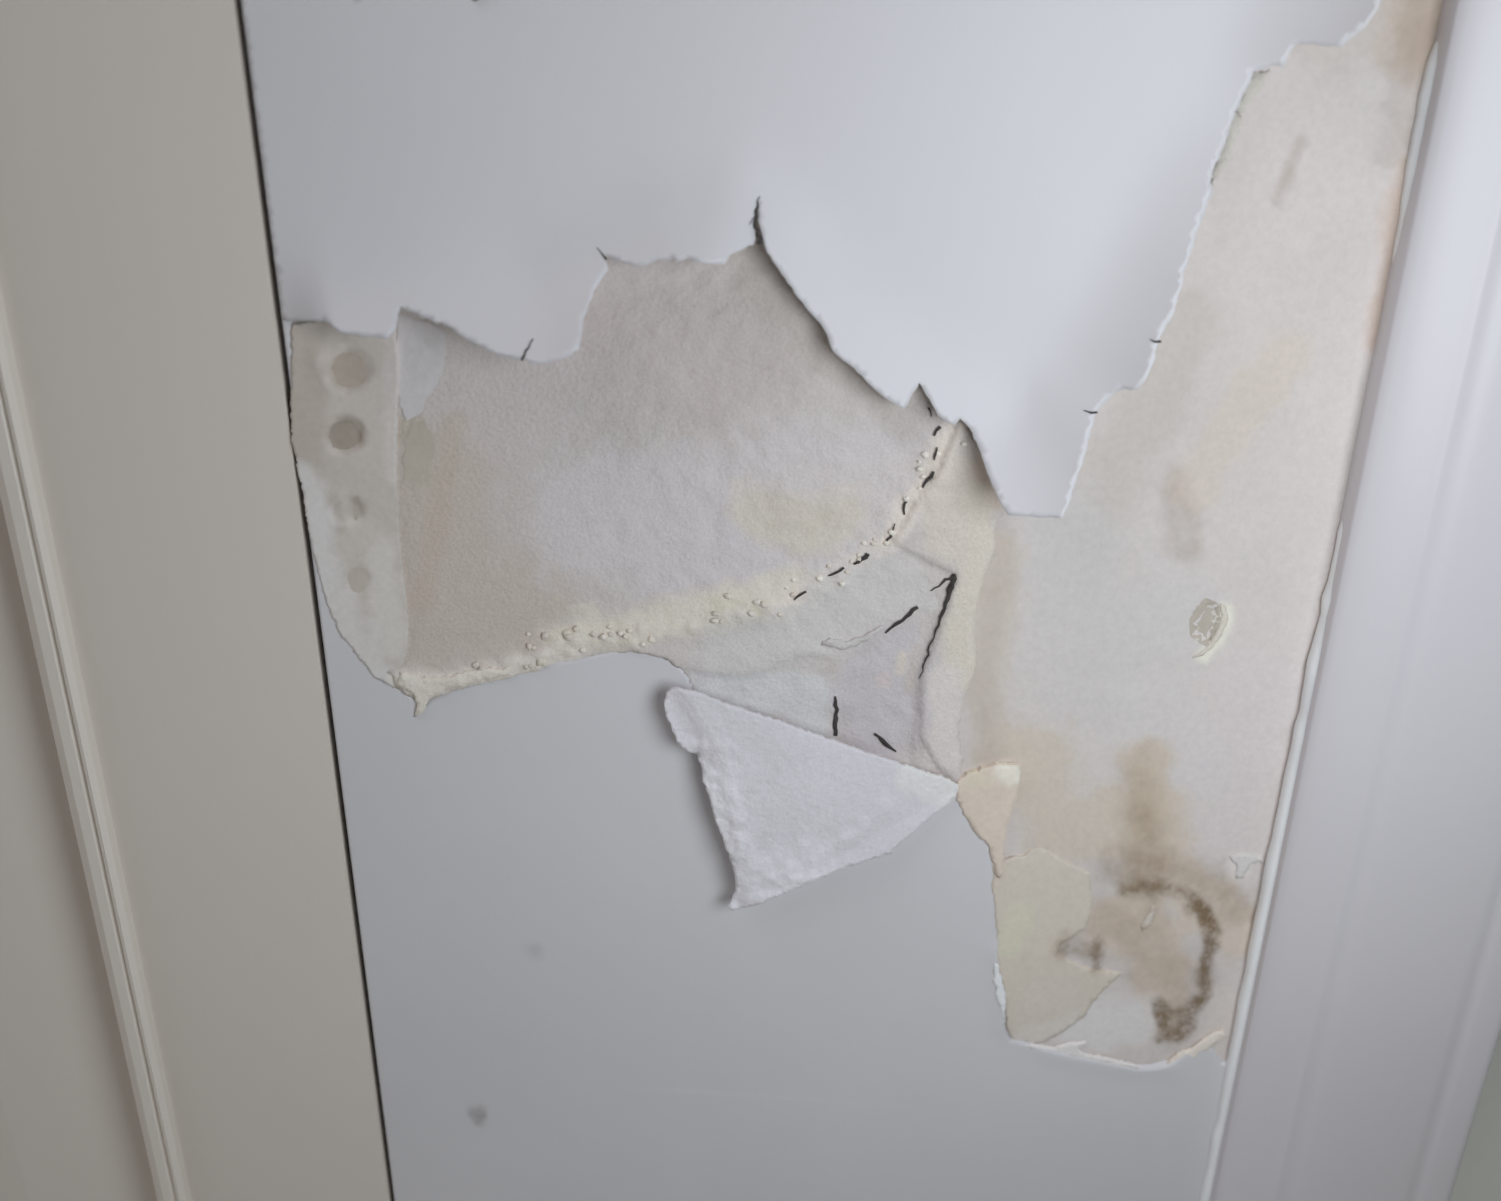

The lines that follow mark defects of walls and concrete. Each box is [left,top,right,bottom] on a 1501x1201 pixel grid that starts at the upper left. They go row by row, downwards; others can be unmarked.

peeling [242,0,1443,1068]